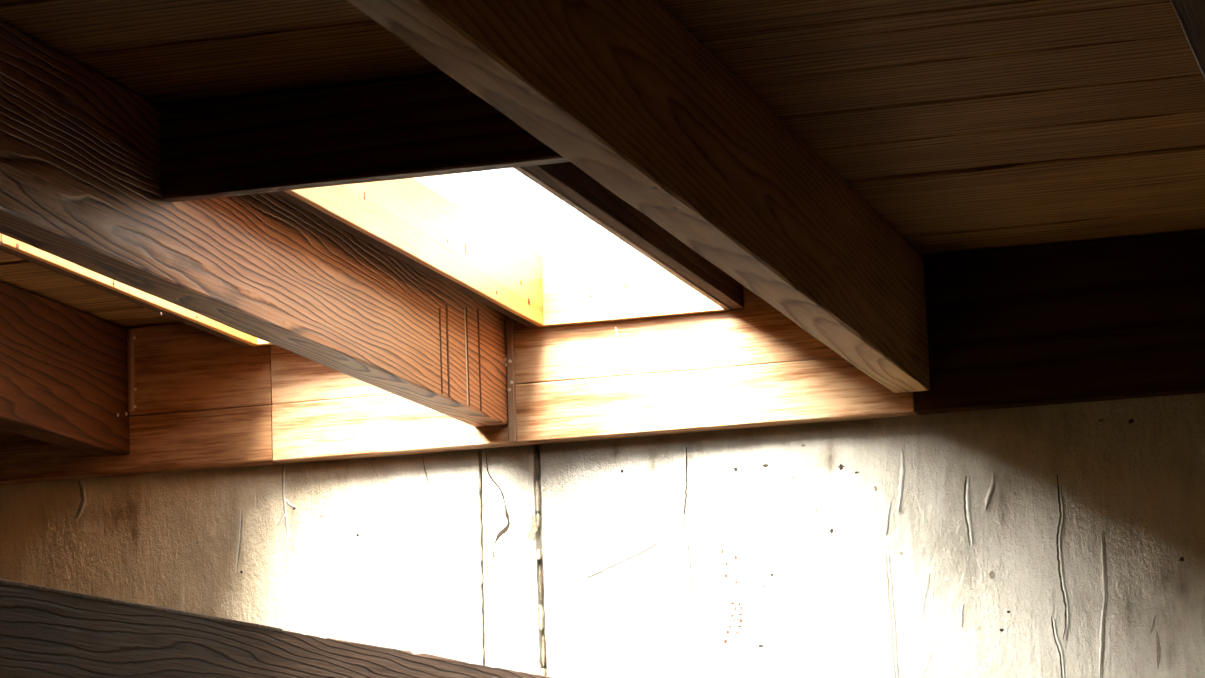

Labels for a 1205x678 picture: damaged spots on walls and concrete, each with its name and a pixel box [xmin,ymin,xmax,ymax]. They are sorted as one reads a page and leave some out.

crack [486,455,510,580]
crack [963,476,973,545]
crack [1051,474,1069,678]
crack [1099,531,1108,678]